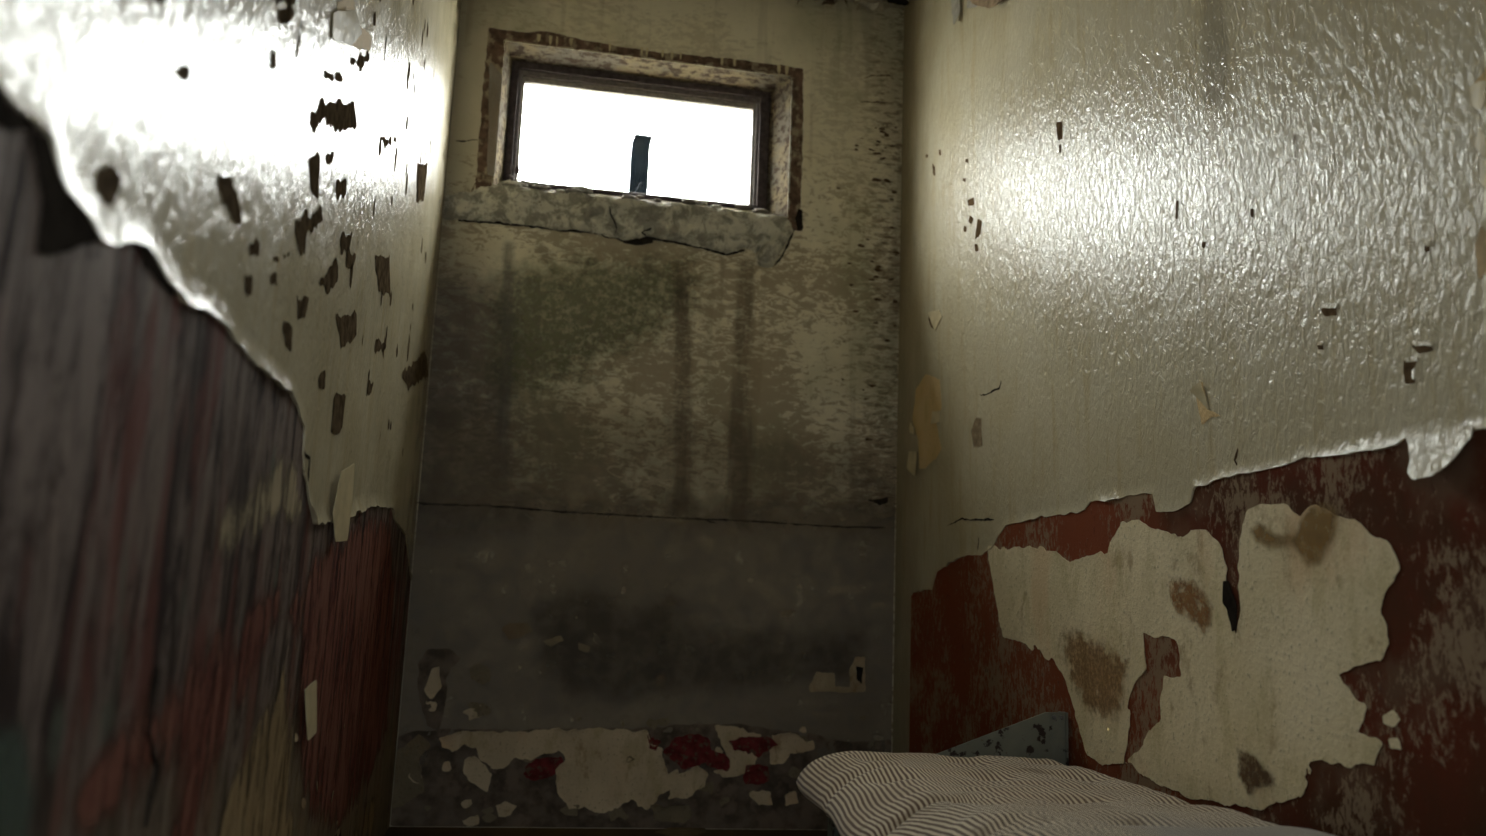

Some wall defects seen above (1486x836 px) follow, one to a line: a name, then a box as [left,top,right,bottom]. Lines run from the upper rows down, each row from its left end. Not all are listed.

spalling [276,0,302,58]
spalling [310,0,387,134]
peeling [855,126,900,201]
peeling [0,26,891,836]
peeling [906,374,942,476]
water stain [398,258,895,758]
peeling [909,409,1486,836]